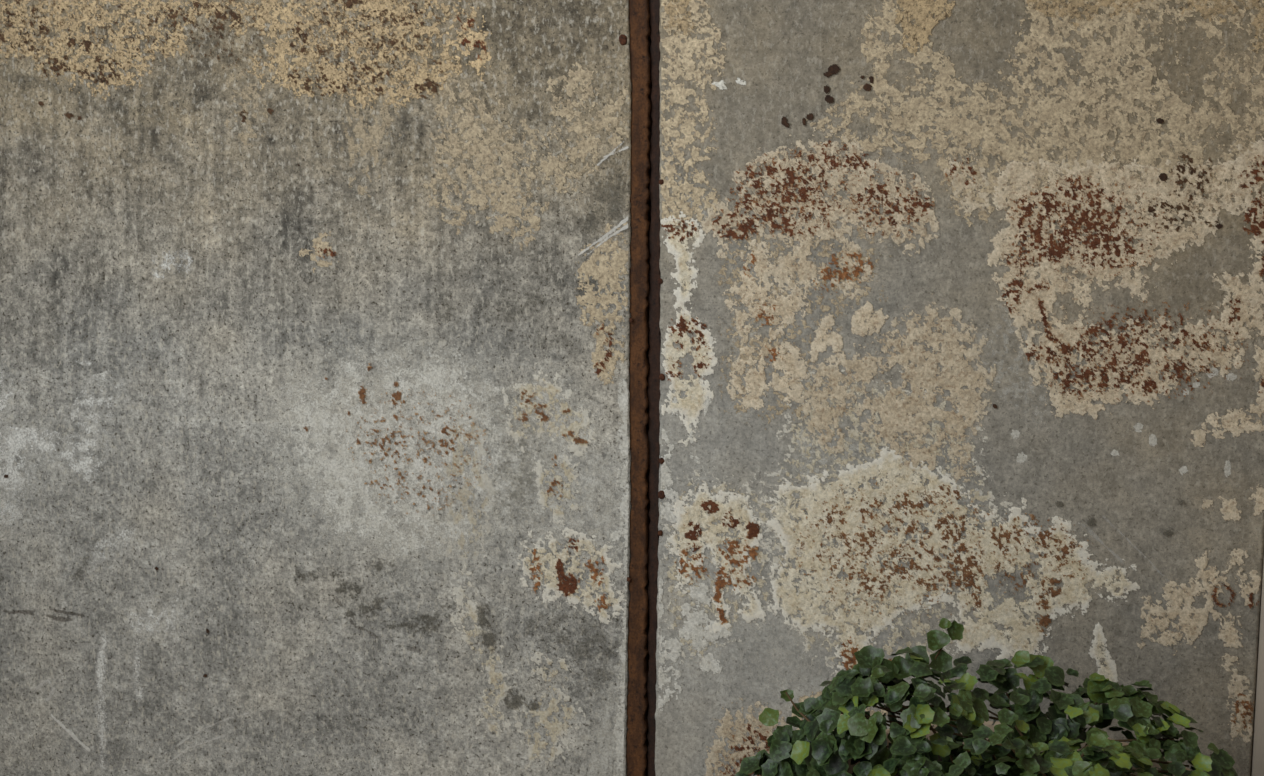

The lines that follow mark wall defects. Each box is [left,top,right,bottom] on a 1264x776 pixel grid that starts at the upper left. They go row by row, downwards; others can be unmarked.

peeling [0,0,630,253]
corrosion [755,297,776,326]
corrosion [660,140,935,277]
corrosion [813,251,873,298]
corrosion [945,156,982,189]
corrosion [1002,149,1249,402]
corrosion [1239,155,1264,277]
peeling [658,0,1264,776]
peeling [501,363,627,624]
corrosion [529,535,610,612]
corrosion [674,500,760,625]
corrosion [780,478,1093,636]